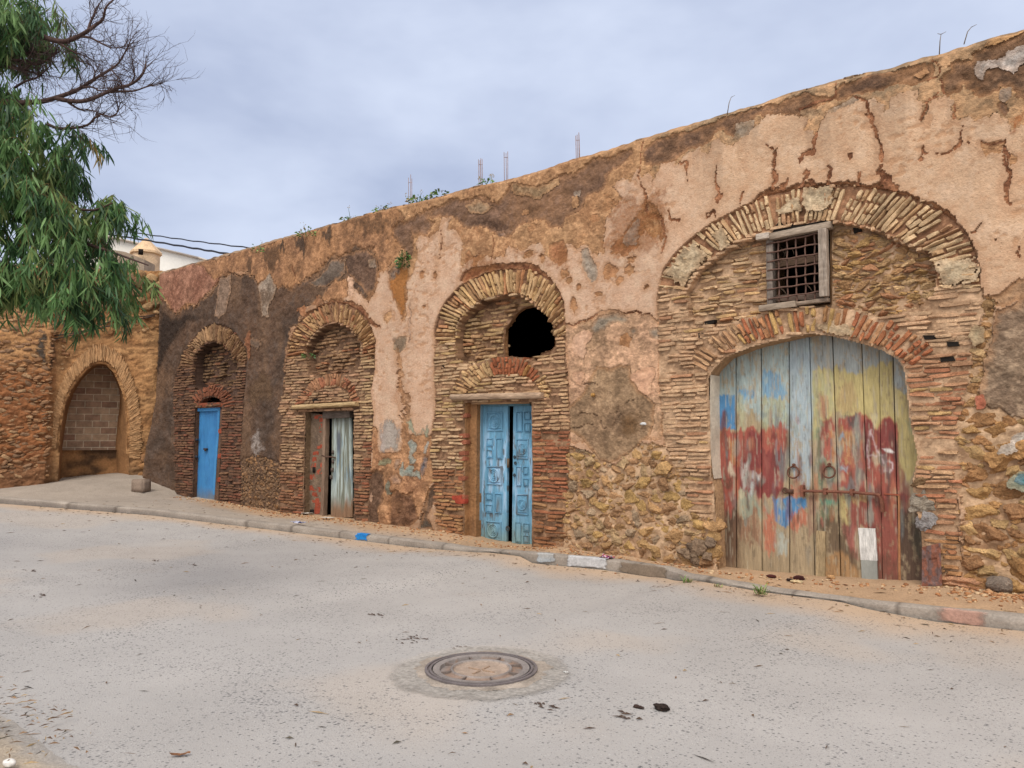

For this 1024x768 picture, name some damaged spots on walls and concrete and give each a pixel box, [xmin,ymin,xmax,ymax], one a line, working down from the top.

crack [766,82,899,192]
crack [918,59,1012,206]
spalling [142,31,1024,530]